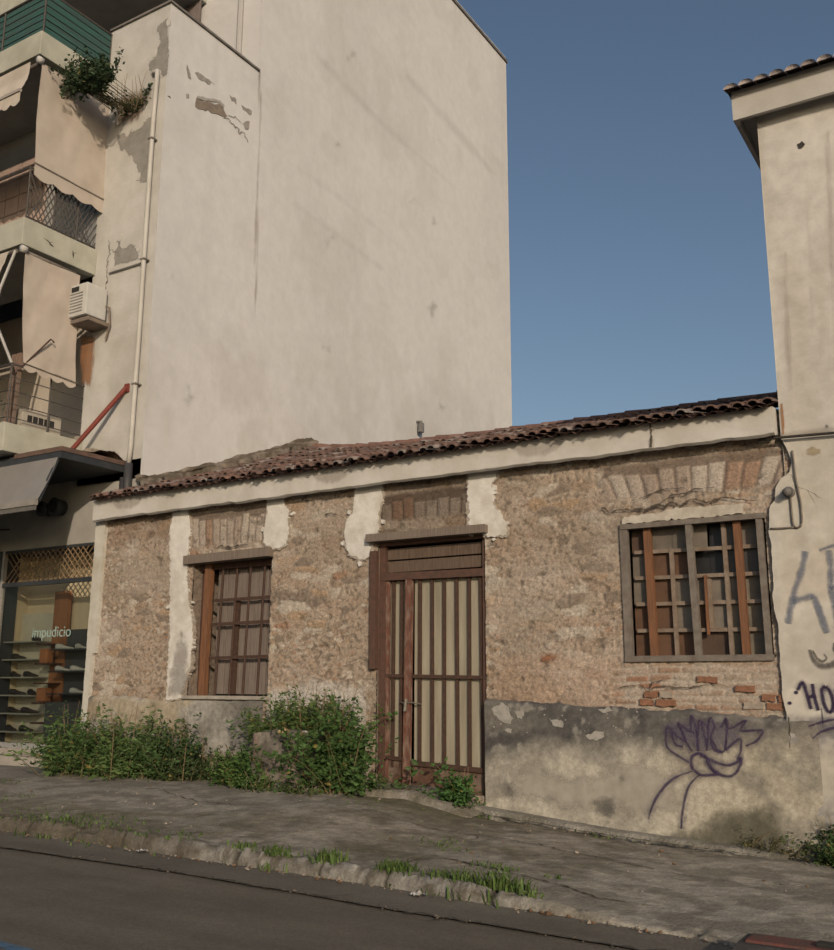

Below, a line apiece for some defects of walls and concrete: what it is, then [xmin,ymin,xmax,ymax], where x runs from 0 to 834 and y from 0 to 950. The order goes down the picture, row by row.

peeling [149,18,171,78]
peeling [186,65,211,85]
spalling [186,94,252,130]
peeling [118,110,152,182]
peeling [261,498,296,551]
peeling [341,484,386,567]
peeling [465,470,510,541]
peeling [166,509,197,703]
peeling [492,702,524,733]
peeling [585,707,631,741]
spalling [735,685,784,710]
leakage [673,811,784,851]